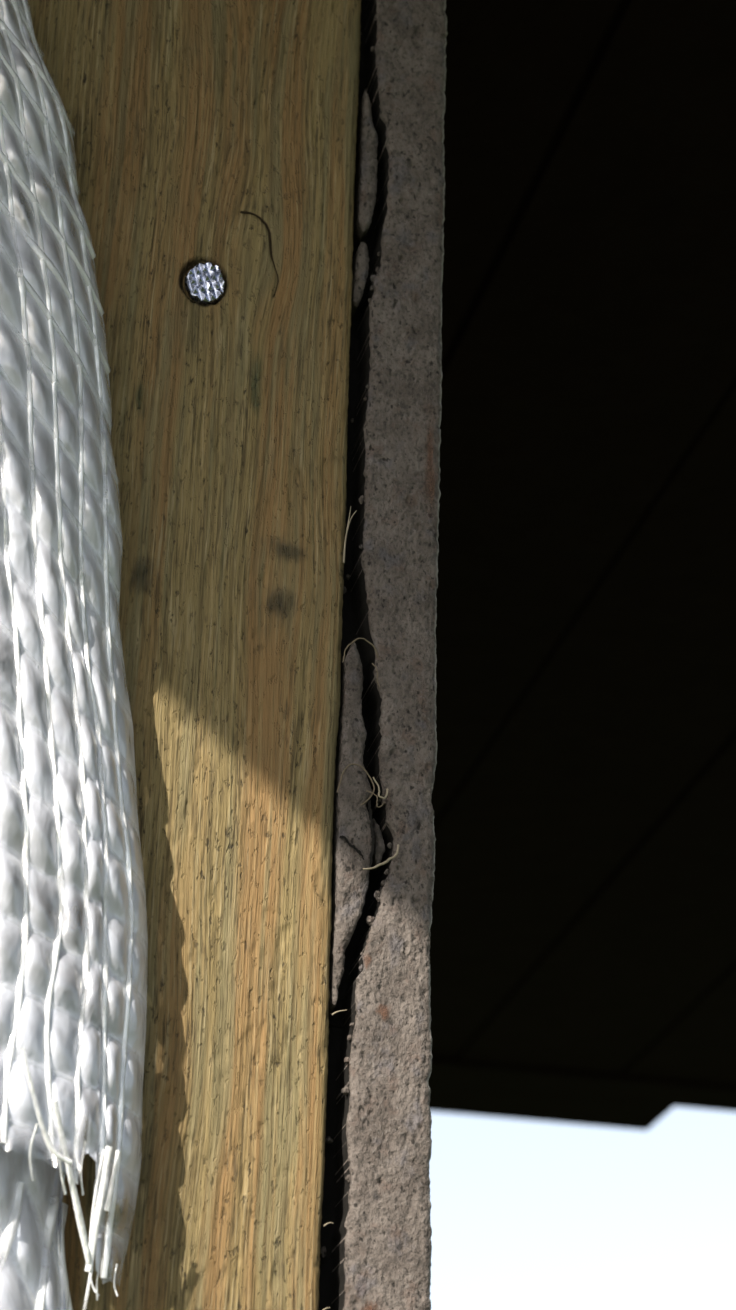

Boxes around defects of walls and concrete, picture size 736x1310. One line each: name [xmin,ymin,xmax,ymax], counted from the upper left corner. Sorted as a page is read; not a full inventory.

crack [350,0,389,335]
crack [328,641,393,1027]